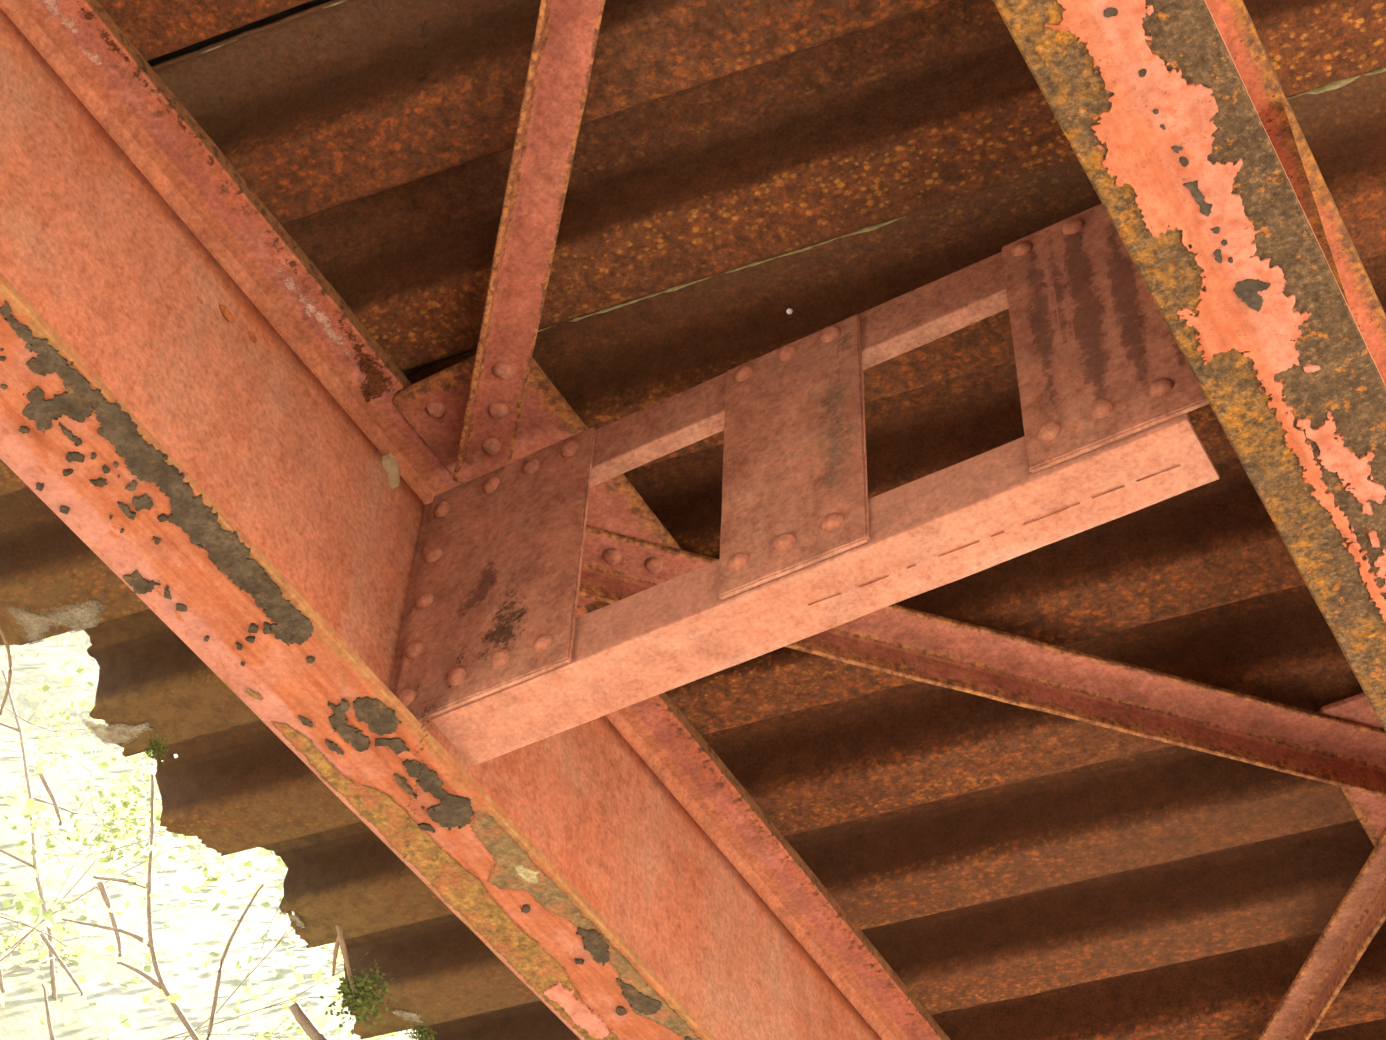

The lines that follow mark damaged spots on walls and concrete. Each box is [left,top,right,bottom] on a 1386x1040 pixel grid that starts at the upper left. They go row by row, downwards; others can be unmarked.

peeling [277,263,354,361]
peeling [1045,0,1386,621]
peeling [0,301,315,666]
peeling [298,696,474,833]
peeling [575,927,610,966]
peeling [544,978,662,1039]